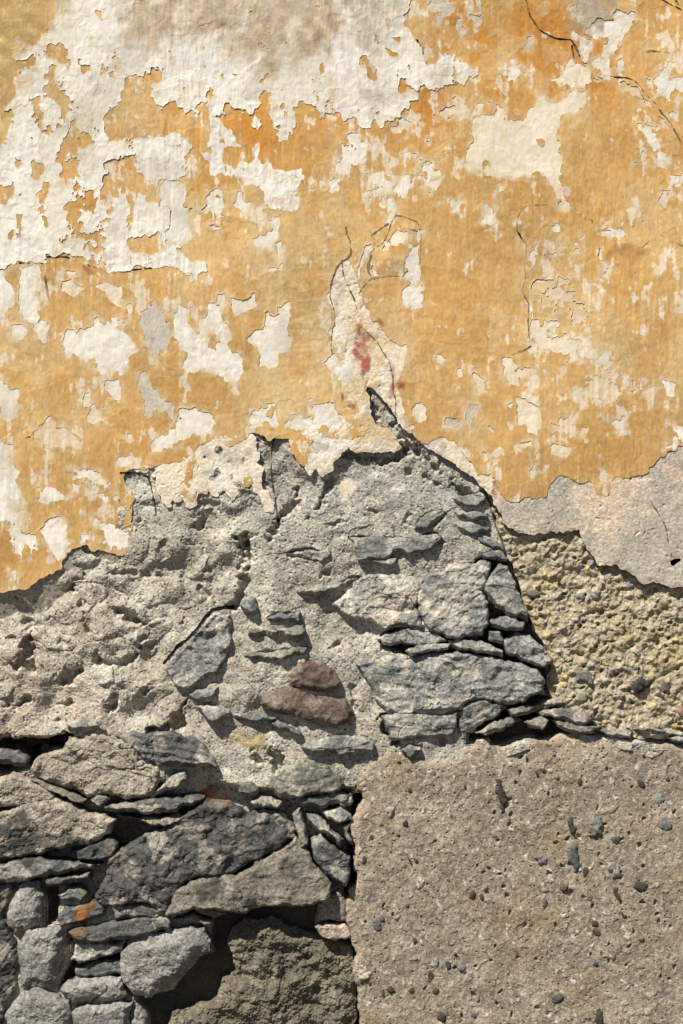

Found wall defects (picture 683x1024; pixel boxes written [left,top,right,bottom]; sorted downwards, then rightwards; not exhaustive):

crack [525,0,587,64]
crack [613,76,681,142]
peeling [0,0,683,744]
crack [329,214,421,416]
crack [512,201,683,355]
spalling [401,744,421,758]